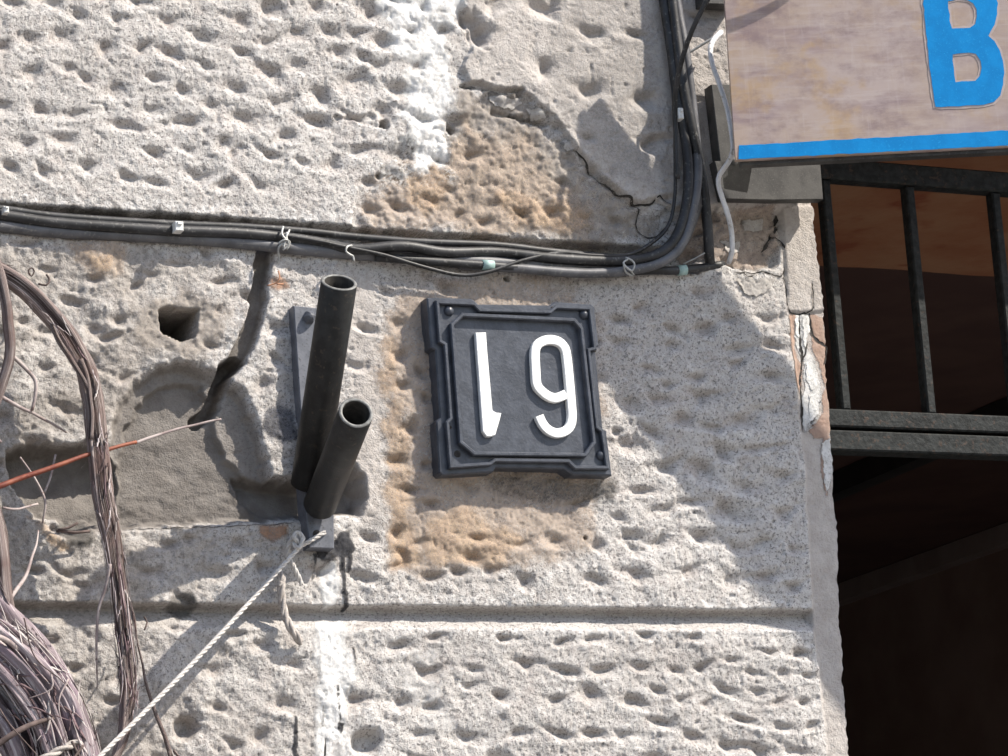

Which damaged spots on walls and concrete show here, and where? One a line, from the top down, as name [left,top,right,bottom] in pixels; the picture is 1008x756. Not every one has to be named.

leakage [374,0,468,189]
spalling [396,87,656,253]
crack [576,151,668,239]
spalling [136,290,222,358]
crack [735,216,827,431]
peeling [789,313,833,495]
leakage [312,549,357,756]